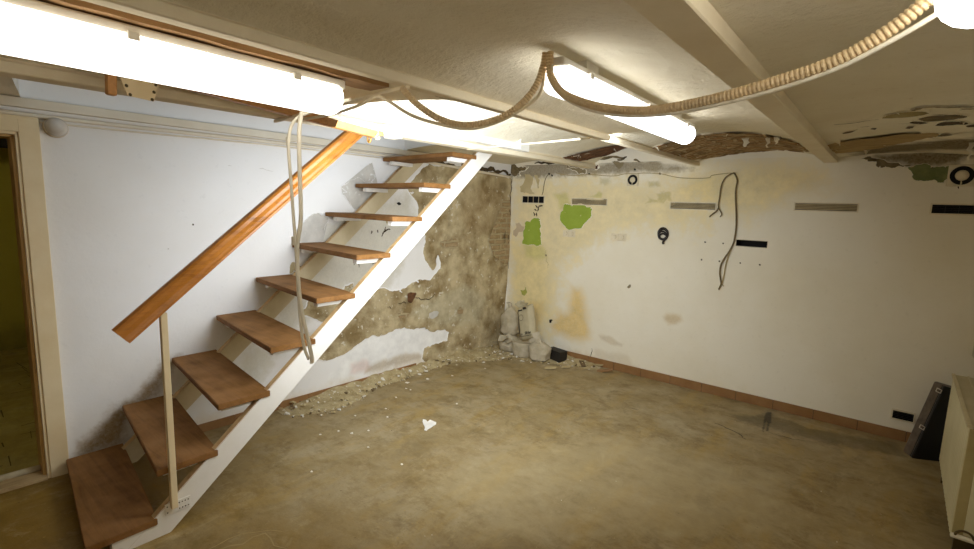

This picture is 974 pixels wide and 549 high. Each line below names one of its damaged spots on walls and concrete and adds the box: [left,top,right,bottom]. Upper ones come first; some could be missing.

peeling [562,145,627,174]
damp [233,342,298,387]
damp [272,239,315,276]
damp [274,296,322,336]
damp [303,196,356,242]
damp [312,176,418,289]
damp [380,235,425,290]
damp [320,274,493,390]
flaking render [279,162,603,418]
damp [588,331,650,370]
damp [496,132,974,313]
damp [67,345,191,459]